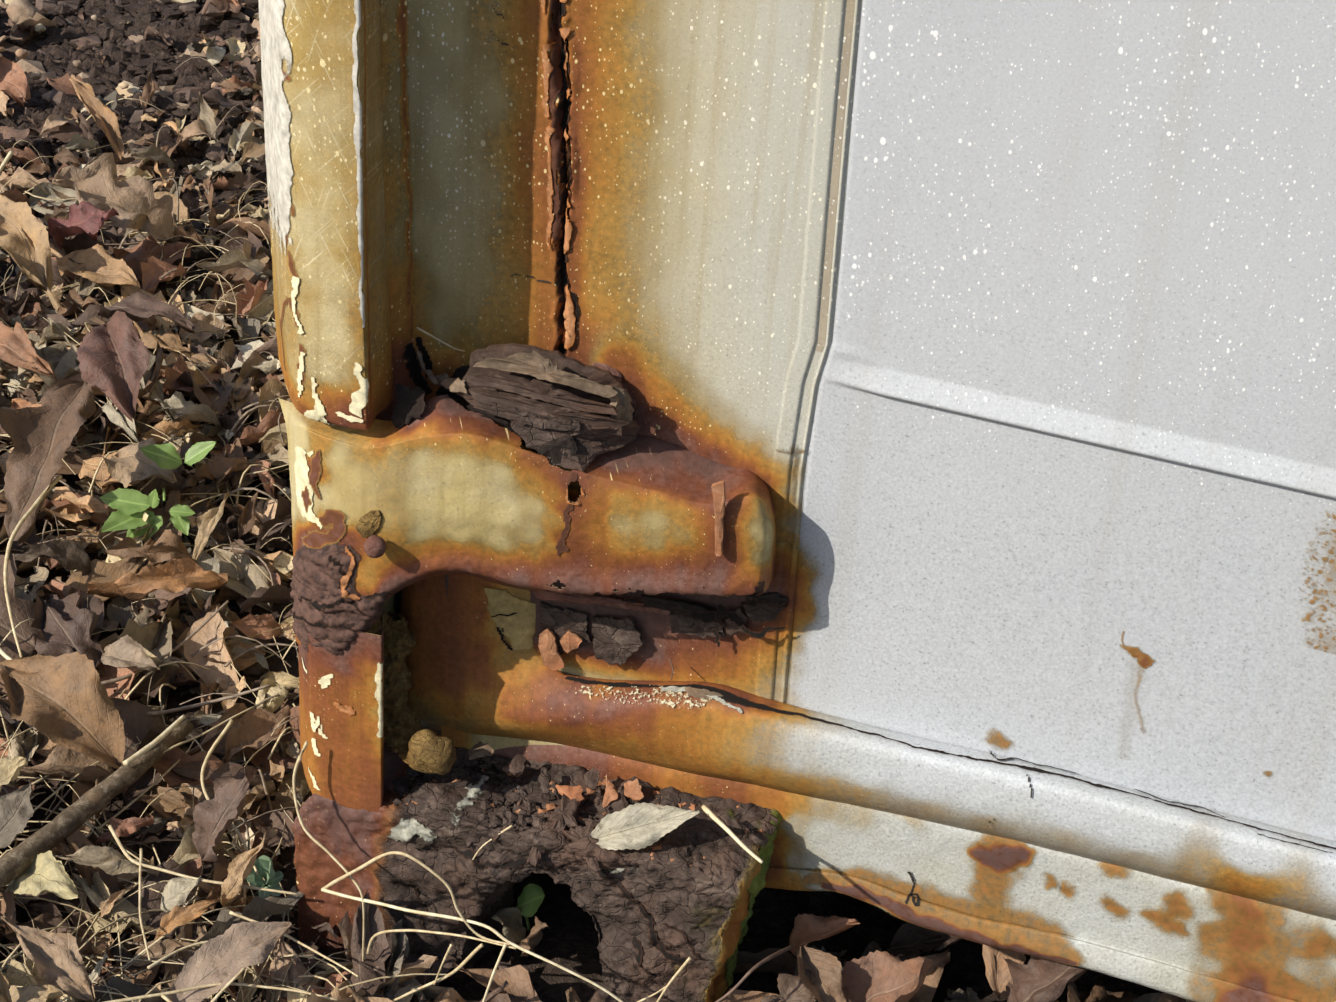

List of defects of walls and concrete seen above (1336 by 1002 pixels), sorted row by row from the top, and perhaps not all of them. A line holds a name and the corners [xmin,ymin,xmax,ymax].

crack [491,0,580,355]
peeling [291,276,304,334]
peeling [297,352,369,425]
peeling [294,446,346,549]
corrosion [270,0,1083,1002]
peeling [484,588,536,651]
corrosion [1120,631,1154,669]
corrosion [1302,514,1336,652]
crack [565,676,1336,853]
corrosion [1099,852,1336,1002]